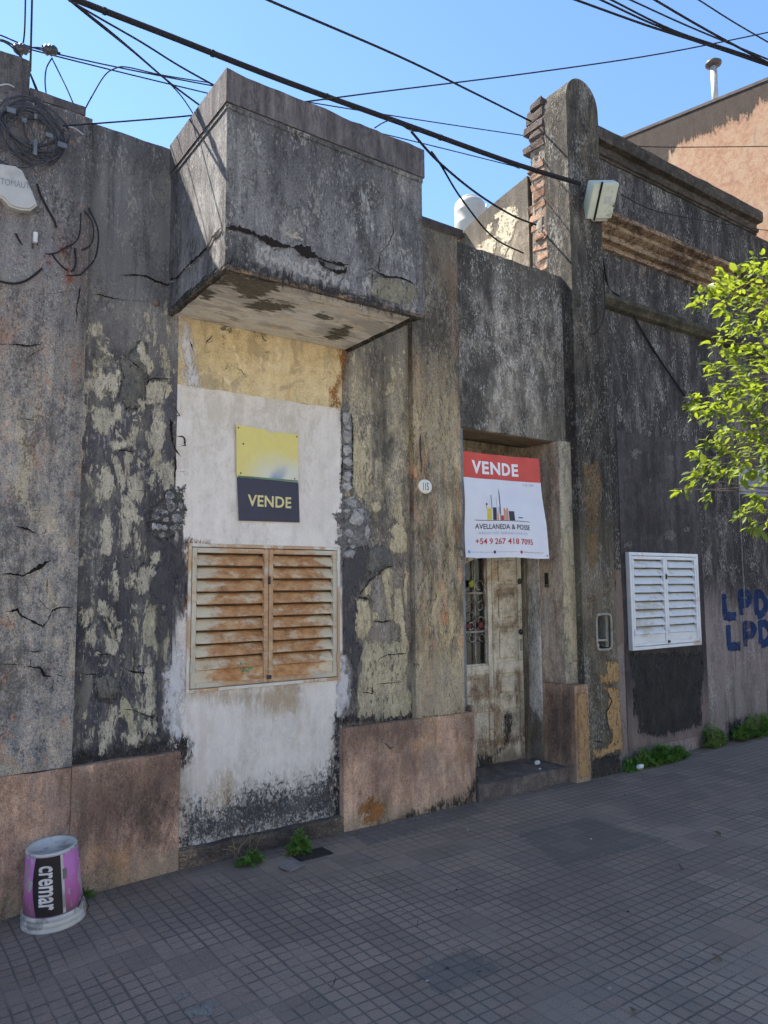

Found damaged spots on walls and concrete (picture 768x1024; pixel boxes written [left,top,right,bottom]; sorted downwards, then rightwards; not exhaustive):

crack [48,215,416,323]
water stain [197,228,418,318]
water stain [314,312,353,341]
peeling [78,301,200,656]
spalling [332,402,408,560]
crack [0,505,159,729]
peeling [83,626,186,756]
water stain [180,546,412,846]
peeling [336,567,461,722]
peeling [576,660,624,779]
corrosion [358,796,385,826]